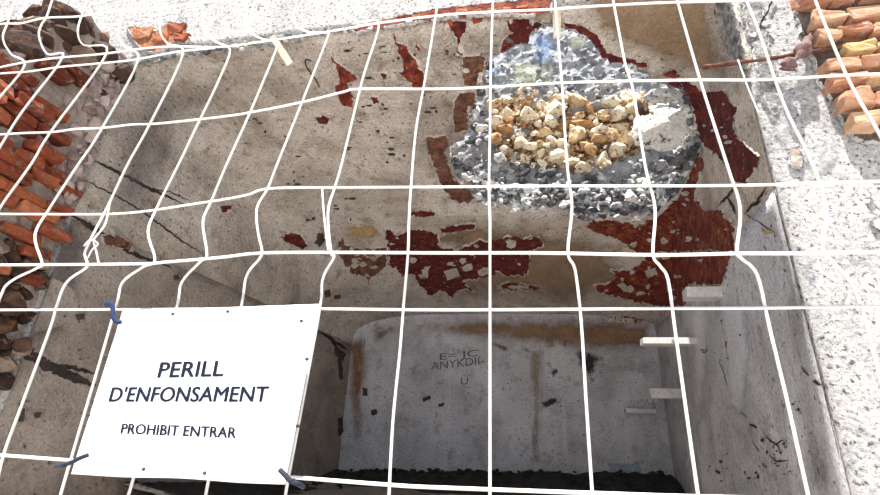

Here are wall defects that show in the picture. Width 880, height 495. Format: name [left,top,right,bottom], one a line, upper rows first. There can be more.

flaking render [124,0,762,307]
crack [86,160,205,256]
crack [718,187,774,233]
crack [70,215,105,235]
crack [121,249,171,268]
flaking render [74,312,86,325]
flaking render [604,313,646,326]
rust [449,323,646,346]
rust [350,341,364,408]